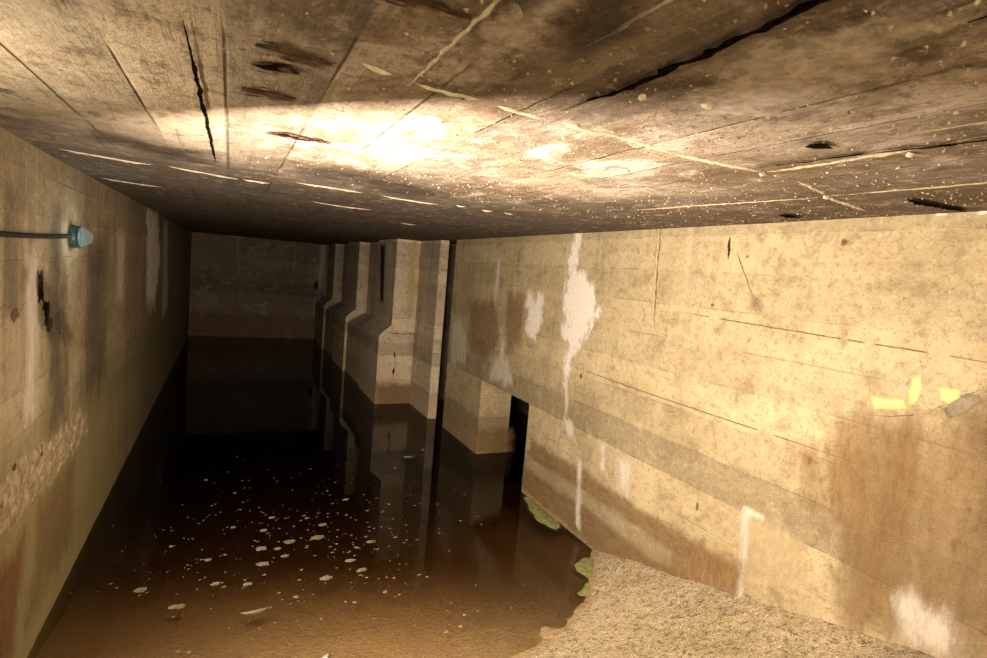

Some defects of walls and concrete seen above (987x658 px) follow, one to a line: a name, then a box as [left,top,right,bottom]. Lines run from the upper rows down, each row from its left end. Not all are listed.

crack [563,0,831,111]
water stain [451,233,602,437]
water stain [856,417,987,651]